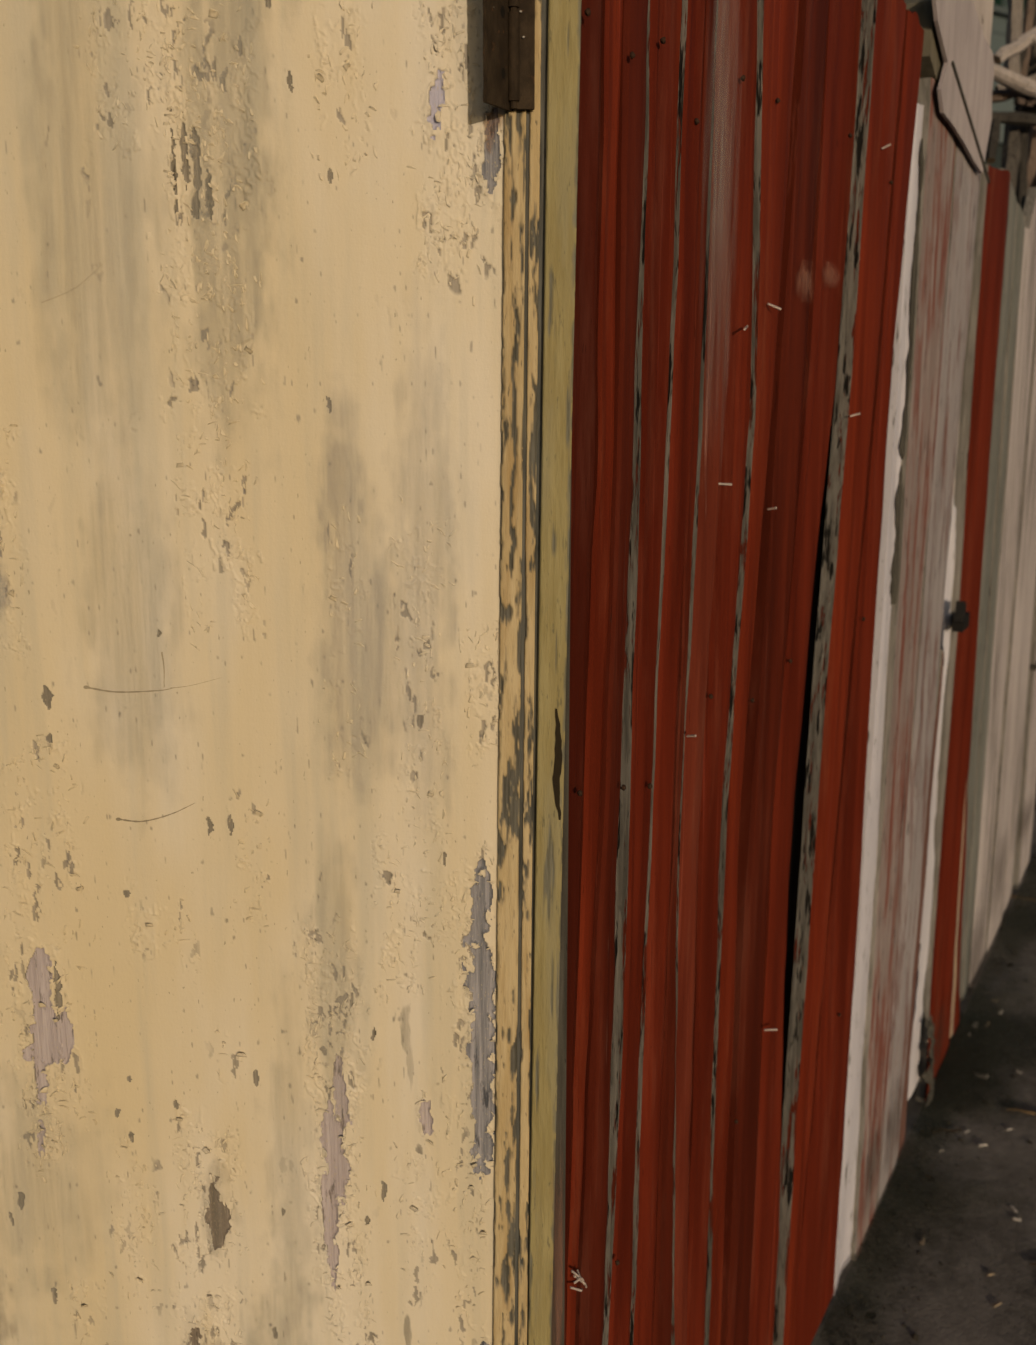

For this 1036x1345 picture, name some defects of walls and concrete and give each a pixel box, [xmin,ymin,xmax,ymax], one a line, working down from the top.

peeling [311,145,378,184]
peeling [406,0,504,306]
peeling [41,685,54,710]
peeling [456,617,500,759]
peeling [0,733,78,919]
peeling [206,789,270,927]
peeling [0,919,260,1345]